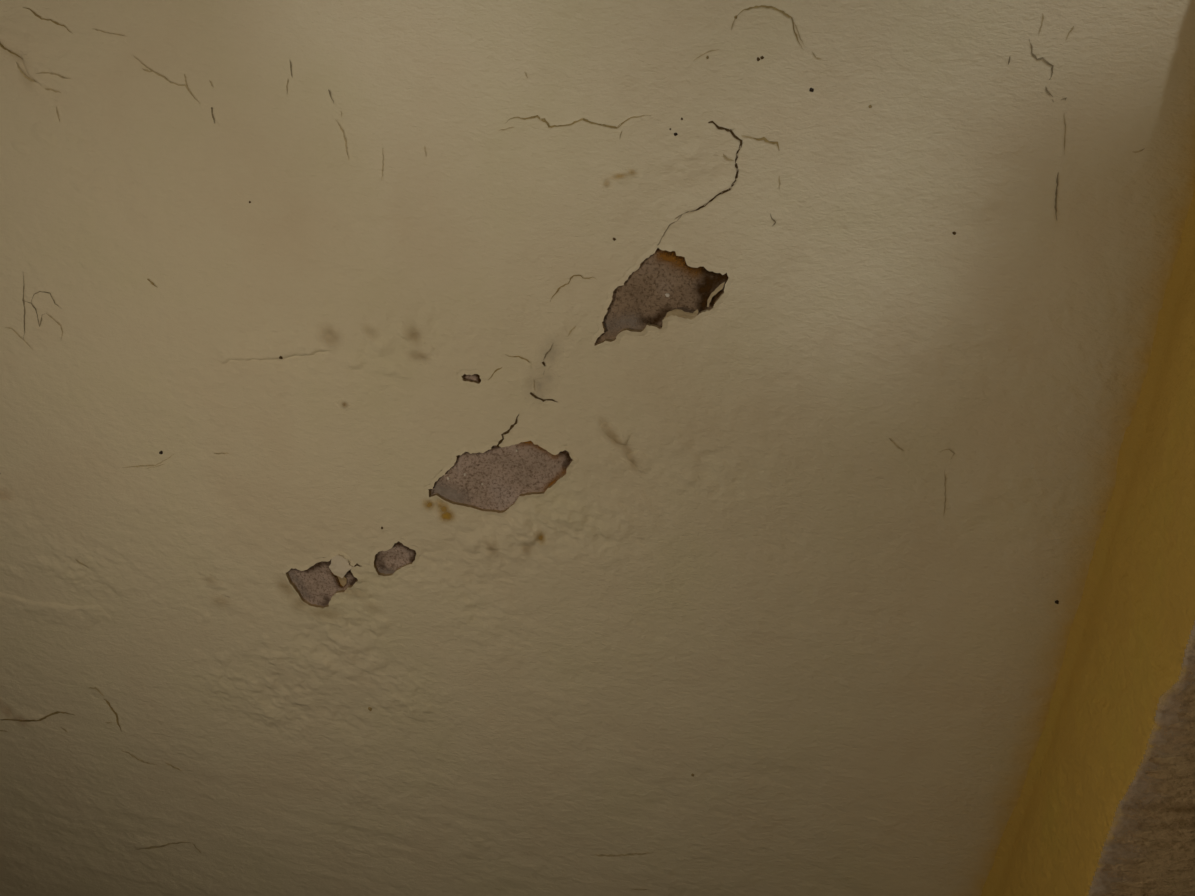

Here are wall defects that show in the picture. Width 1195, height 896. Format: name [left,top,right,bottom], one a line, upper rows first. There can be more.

crack [696,5,821,59]
crack [499,115,651,136]
crack [658,121,781,245]
peeling [590,242,734,350]
peeling [424,436,579,517]
peeling [282,537,421,612]